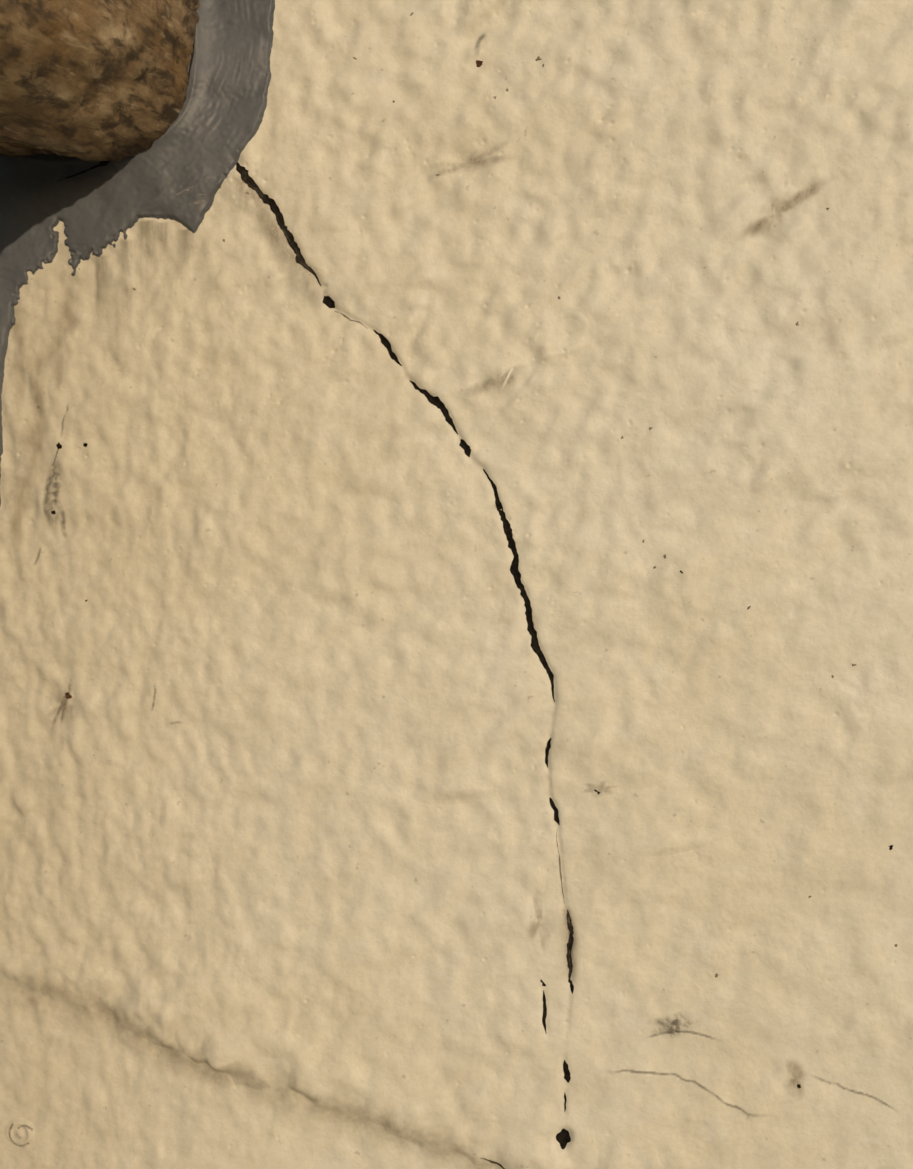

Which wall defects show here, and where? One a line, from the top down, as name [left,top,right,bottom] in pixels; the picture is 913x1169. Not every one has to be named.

crack [236,162,555,702]
crack [544,738,552,768]
crack [540,798,574,1032]
crack [563,1060,571,1111]